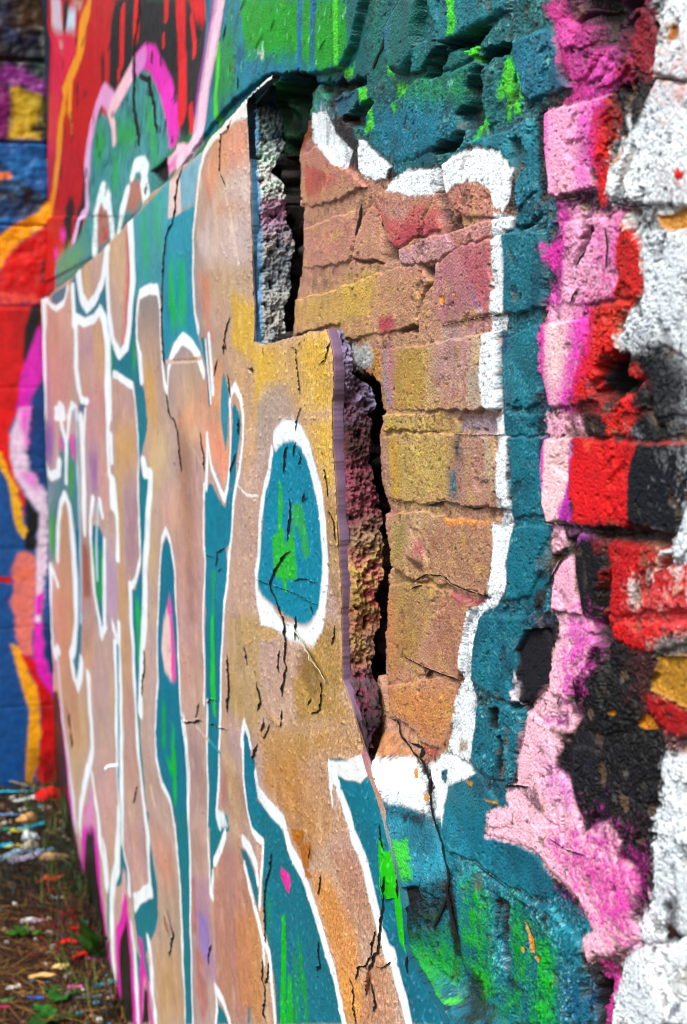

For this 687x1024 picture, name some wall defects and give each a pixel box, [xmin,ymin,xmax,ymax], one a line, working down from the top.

spalling [288,70,321,94]
crack [160,168,182,363]
flaking render [254,84,295,344]
crack [180,341,335,759]
crack [412,573,485,596]
crack [349,826,408,1024]
crack [392,717,459,942]